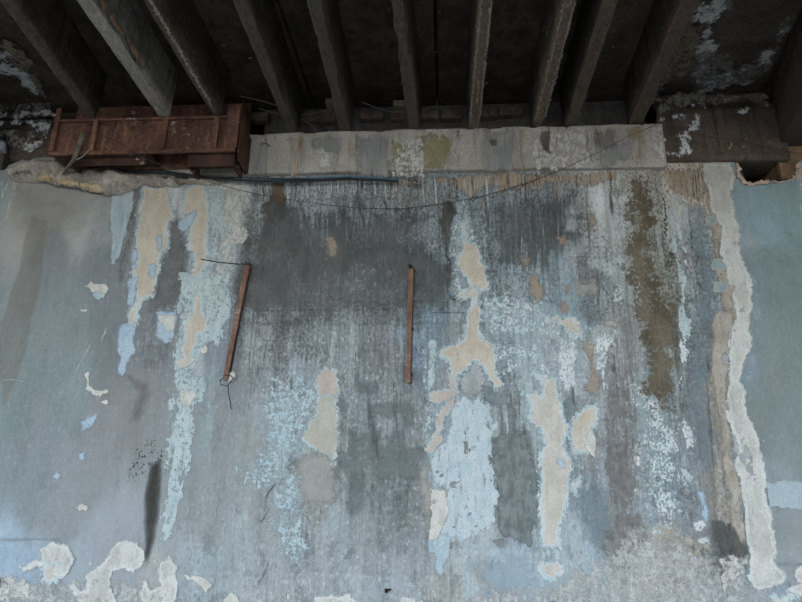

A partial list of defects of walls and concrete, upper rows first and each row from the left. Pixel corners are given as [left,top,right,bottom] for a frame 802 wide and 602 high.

damp [0,39,56,153]
damp [483,0,797,174]
peeling [0,539,145,602]
peeling [7,159,249,543]
damp [145,462,160,557]
damp [154,221,188,309]
peeling [139,554,213,602]
peeling [235,366,341,567]
damp [253,131,459,297]
peeling [418,197,600,584]
damp [455,176,754,602]
peeling [661,162,802,602]